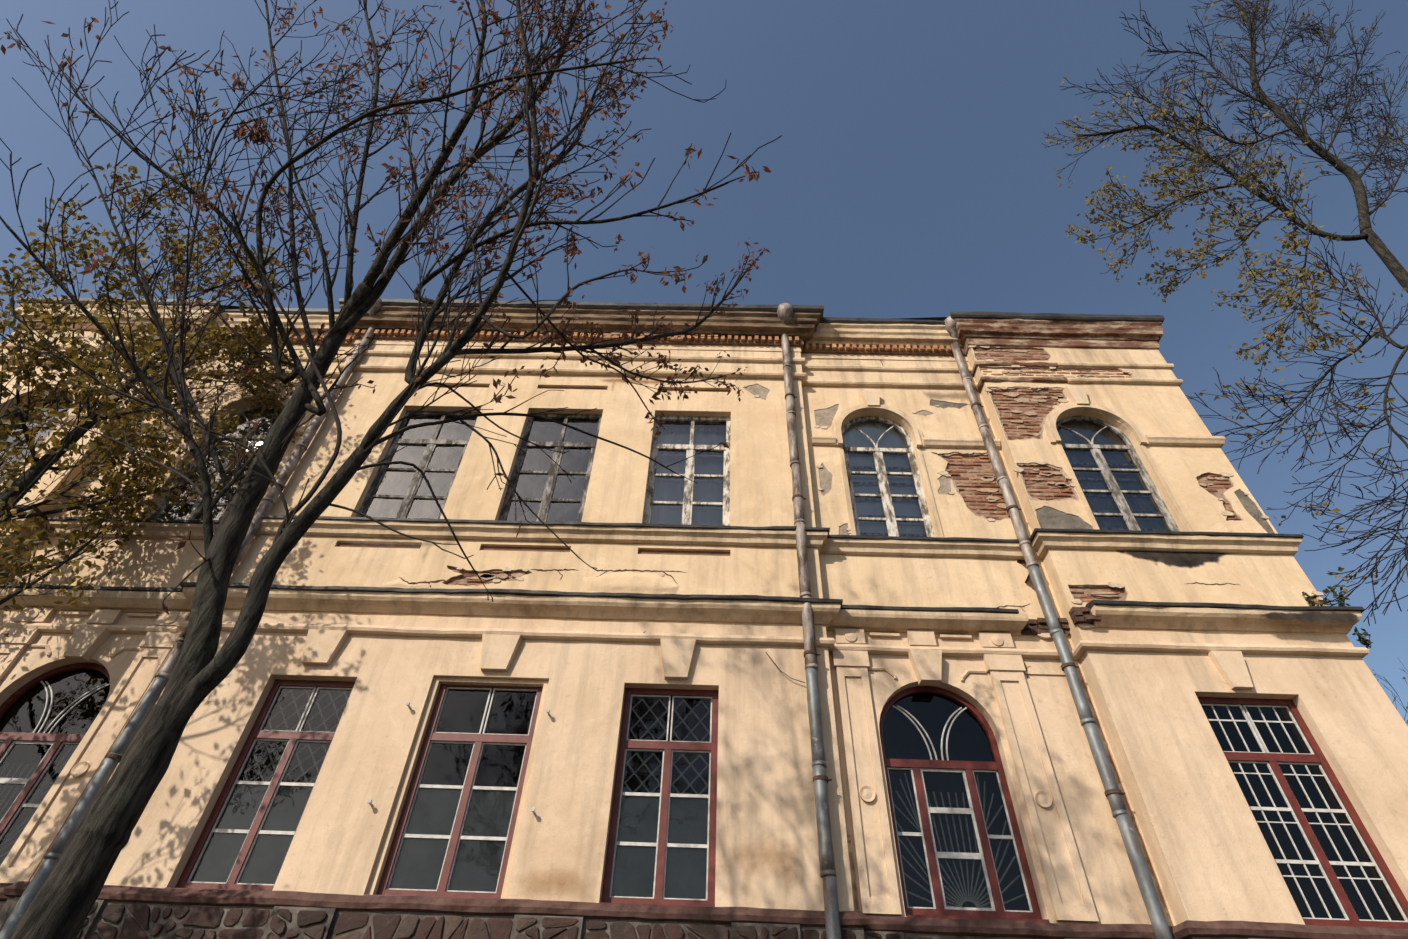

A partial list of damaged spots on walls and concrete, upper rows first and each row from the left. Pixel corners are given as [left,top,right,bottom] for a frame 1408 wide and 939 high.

flaking render [743,384,770,400]
flaking render [968,345,1133,440]
flaking render [814,404,839,429]
flaking render [912,400,971,416]
flaking render [816,464,832,496]
flaking render [933,450,1011,522]
flaking render [1013,461,1079,501]
flaking render [1196,472,1248,521]
flaking render [444,566,532,586]
crack [531,568,687,583]
flaking render [1068,582,1128,604]
peeling [1036,623,1094,639]